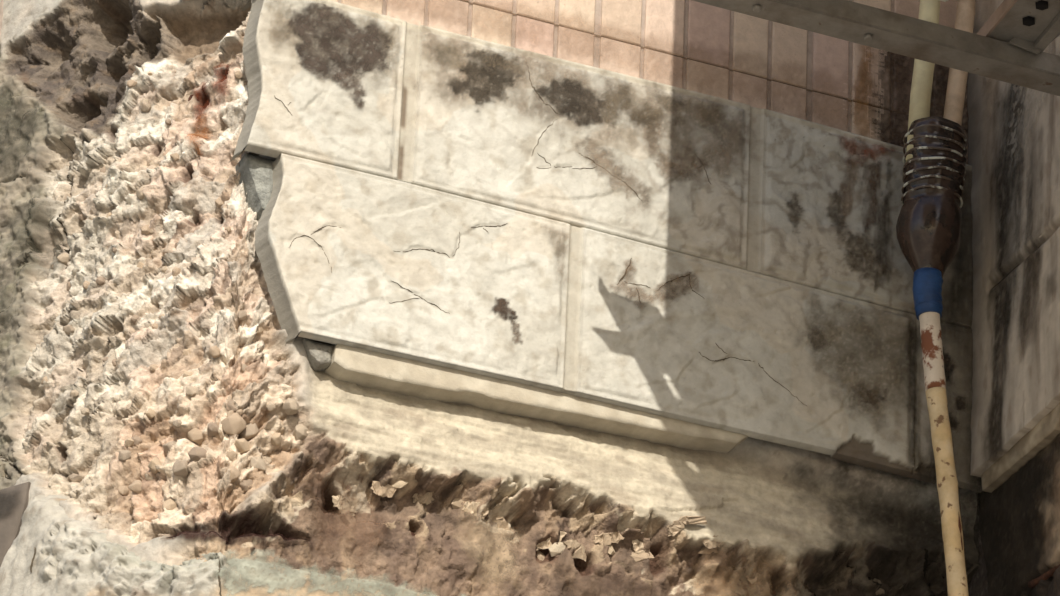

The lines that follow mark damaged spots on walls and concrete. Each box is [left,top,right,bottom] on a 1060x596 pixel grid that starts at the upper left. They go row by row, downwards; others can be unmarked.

mould [275,3,390,107]
mould [437,46,519,104]
crack [528,70,642,201]
damp [537,79,705,179]
spalling [2,0,310,545]
crack [290,225,341,272]
crack [392,281,450,314]
crack [395,223,508,257]
damp [493,298,522,342]
peeling [943,353,954,381]
spalling [181,424,948,596]
spalling [957,479,977,585]